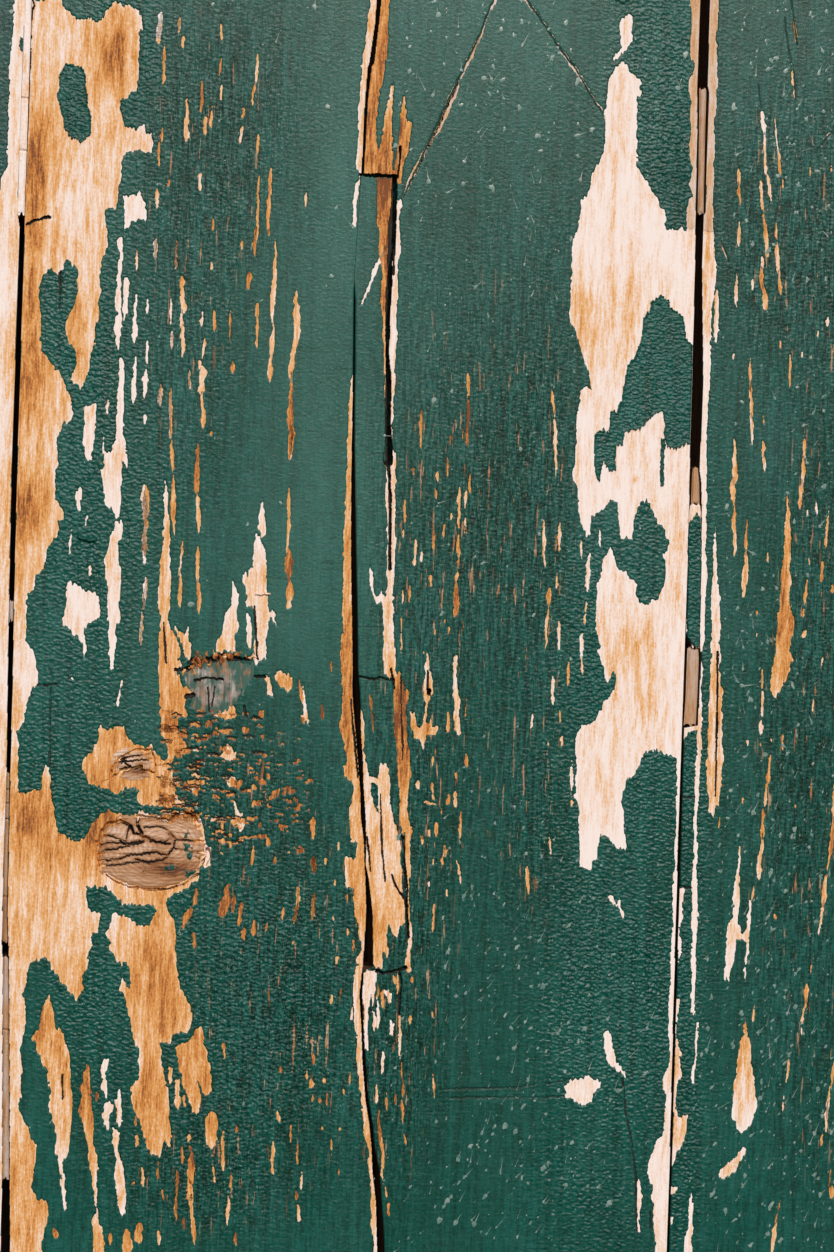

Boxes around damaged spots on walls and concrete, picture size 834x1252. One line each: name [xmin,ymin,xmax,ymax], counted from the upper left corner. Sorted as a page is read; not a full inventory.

crack [28,0,36,69]
peeling [352,0,412,412]
peeling [8,0,313,1252]
peeling [564,0,724,1252]
peeling [770,496,794,698]
crack [350,667,410,1016]
peeling [719,1017,757,1179]